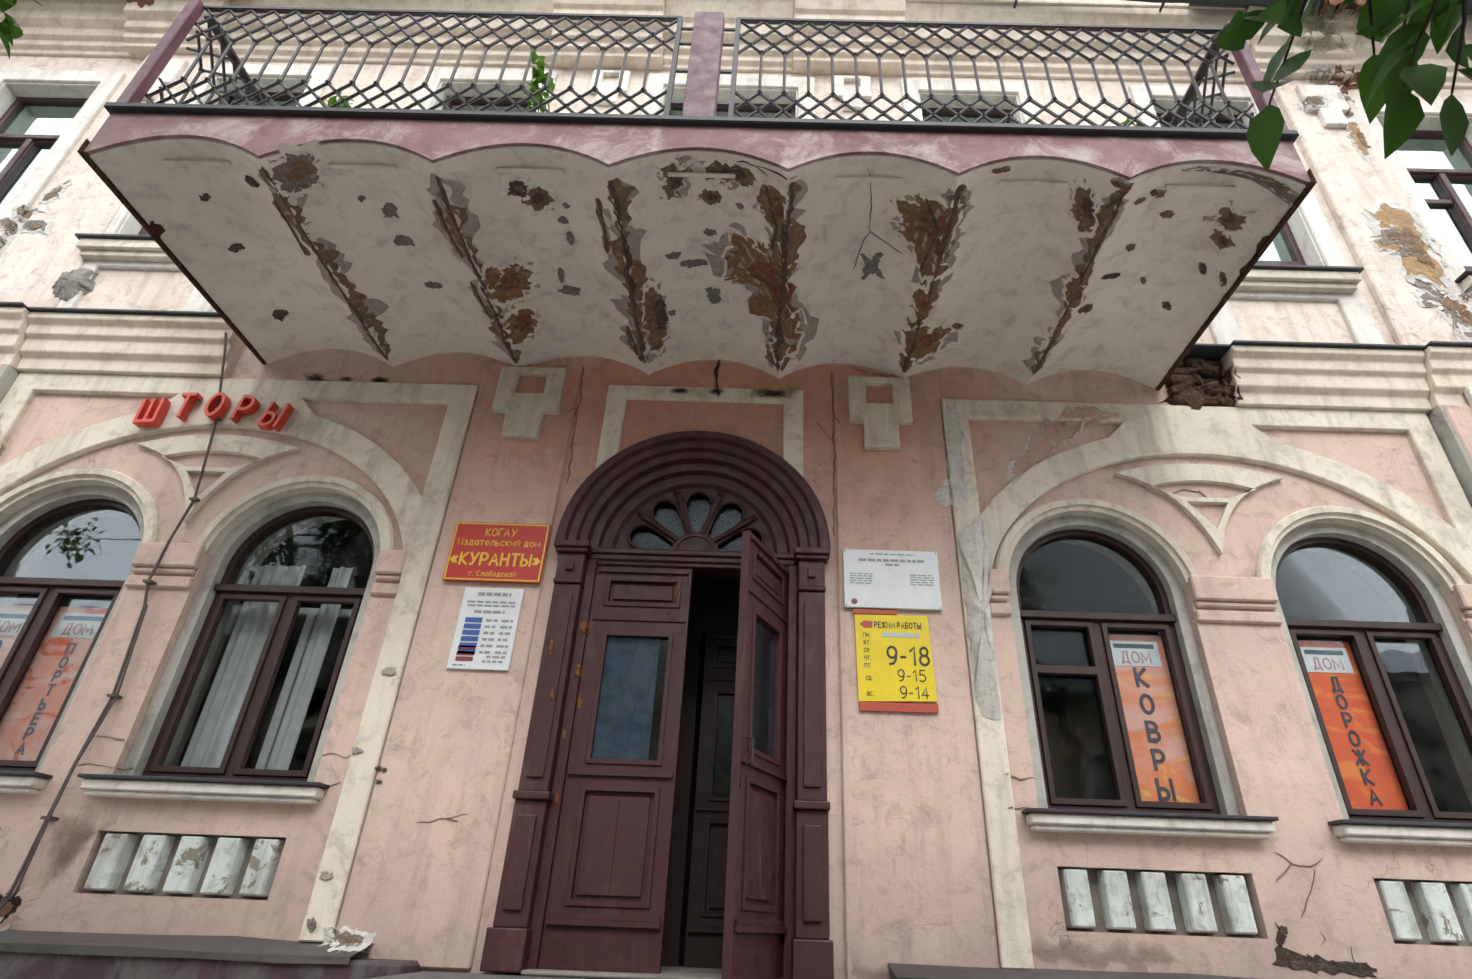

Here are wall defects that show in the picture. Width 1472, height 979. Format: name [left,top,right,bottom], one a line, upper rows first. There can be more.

peeling [228,243,246,253]
peeling [245,139,391,361]
peeling [426,173,581,363]
spalling [595,152,819,371]
peeling [861,252,885,280]
crack [853,169,901,269]
spalling [889,184,975,373]
spalling [1360,196,1472,342]
spalling [1160,357,1243,410]
spalling [307,917,376,953]
crack [1275,852,1355,962]
spalling [1272,925,1377,978]